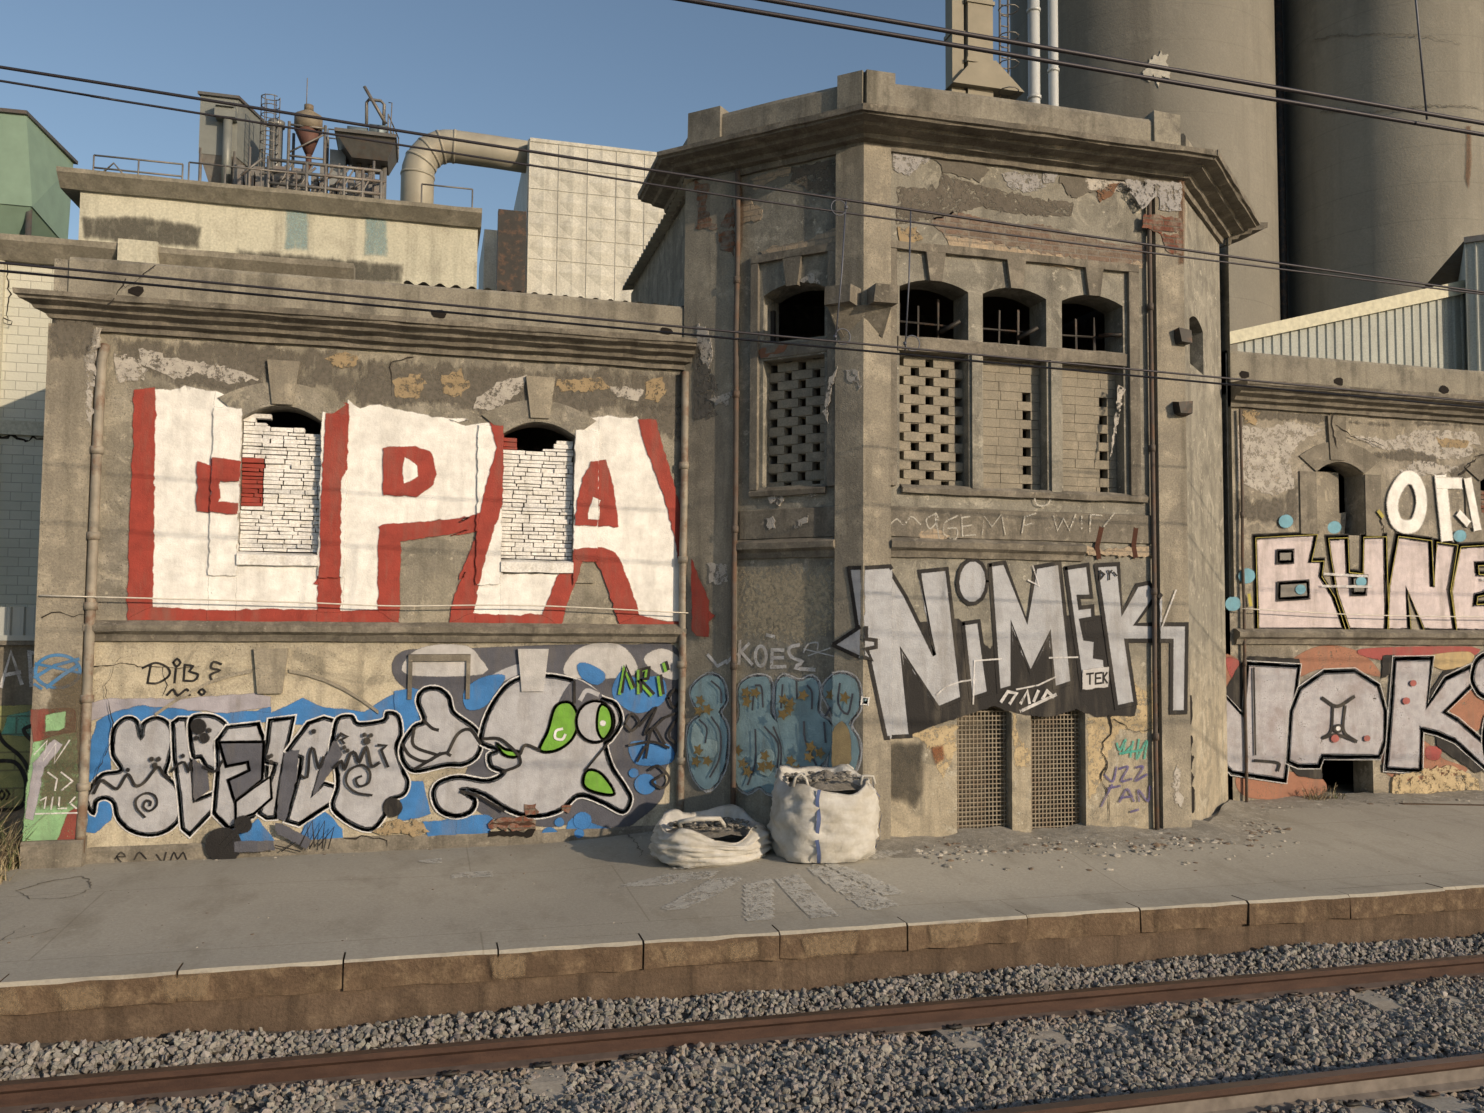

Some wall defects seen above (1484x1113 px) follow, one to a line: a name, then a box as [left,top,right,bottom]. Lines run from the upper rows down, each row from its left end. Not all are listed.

peeling [1143,51,1170,88]
flaking render [694,159,836,256]
peeling [892,153,1183,271]
flaking render [800,273,820,284]
peeling [84,327,259,426]
flaking render [325,352,358,369]
flaking render [392,368,527,411]
flaking render [556,377,667,403]
peeling [1236,409,1322,496]
peeling [1354,428,1481,476]